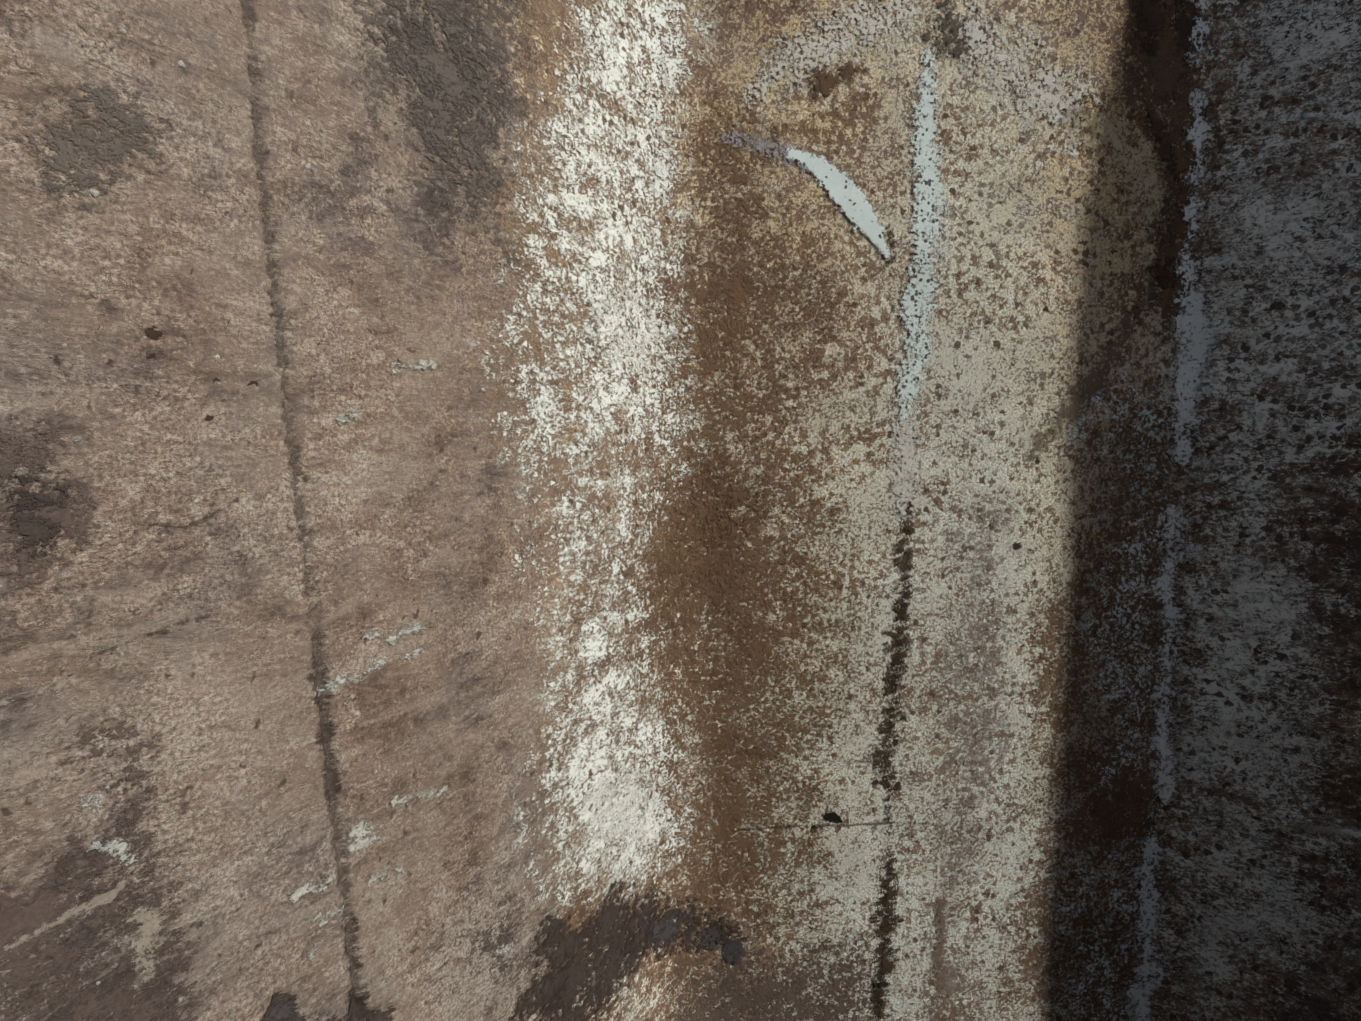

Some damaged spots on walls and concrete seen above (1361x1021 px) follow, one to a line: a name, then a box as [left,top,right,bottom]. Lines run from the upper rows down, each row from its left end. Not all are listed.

leakage [353,0,543,278]
rust [805,61,862,99]
crack [923,0,973,60]
rust [621,95,869,949]
rust [999,370,1228,1021]
leakage [340,904,370,1008]
leakage [508,874,896,1021]